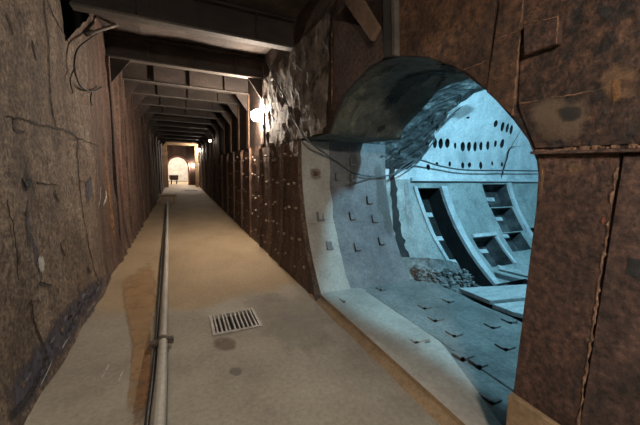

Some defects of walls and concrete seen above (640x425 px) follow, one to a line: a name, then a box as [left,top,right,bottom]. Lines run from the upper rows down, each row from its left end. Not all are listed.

crack [8,0,99,281]
crack [6,200,19,279]
damp [9,281,108,418]